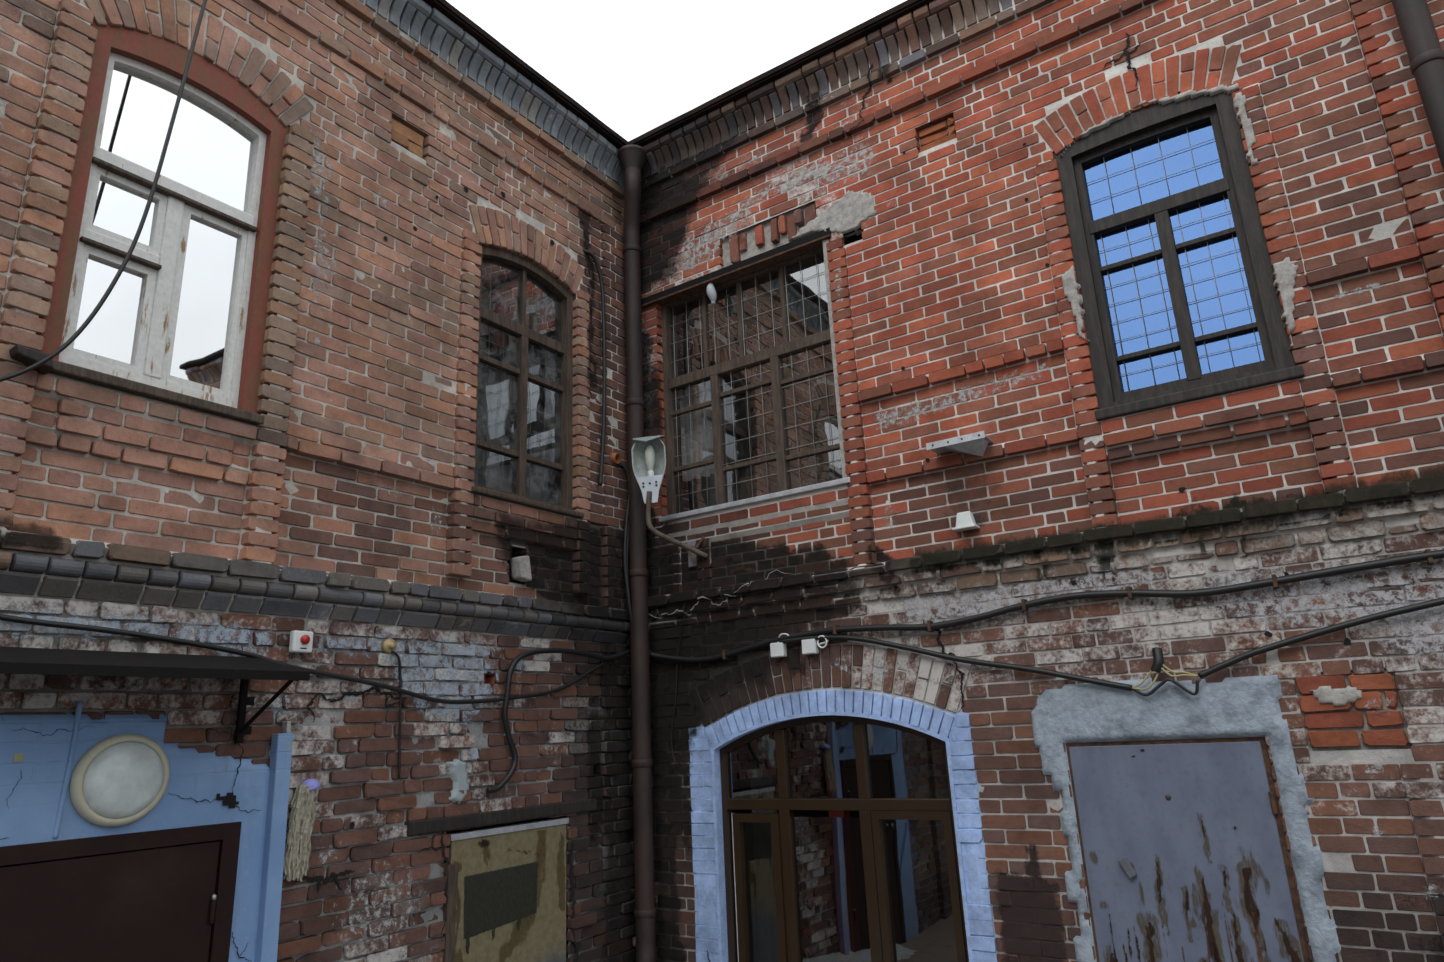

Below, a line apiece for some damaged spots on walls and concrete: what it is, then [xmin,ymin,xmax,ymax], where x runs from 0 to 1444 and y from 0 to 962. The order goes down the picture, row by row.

crack [1103,32,1141,86]
spalling [720,201,817,267]
spalling [843,228,863,245]
peeling [2,606,275,657]
peeling [895,566,1165,626]
peeling [1195,558,1444,669]
peeling [318,631,523,725]
flaking render [216,792,239,808]
peeling [333,862,425,955]
corrosion [1100,812,1303,962]